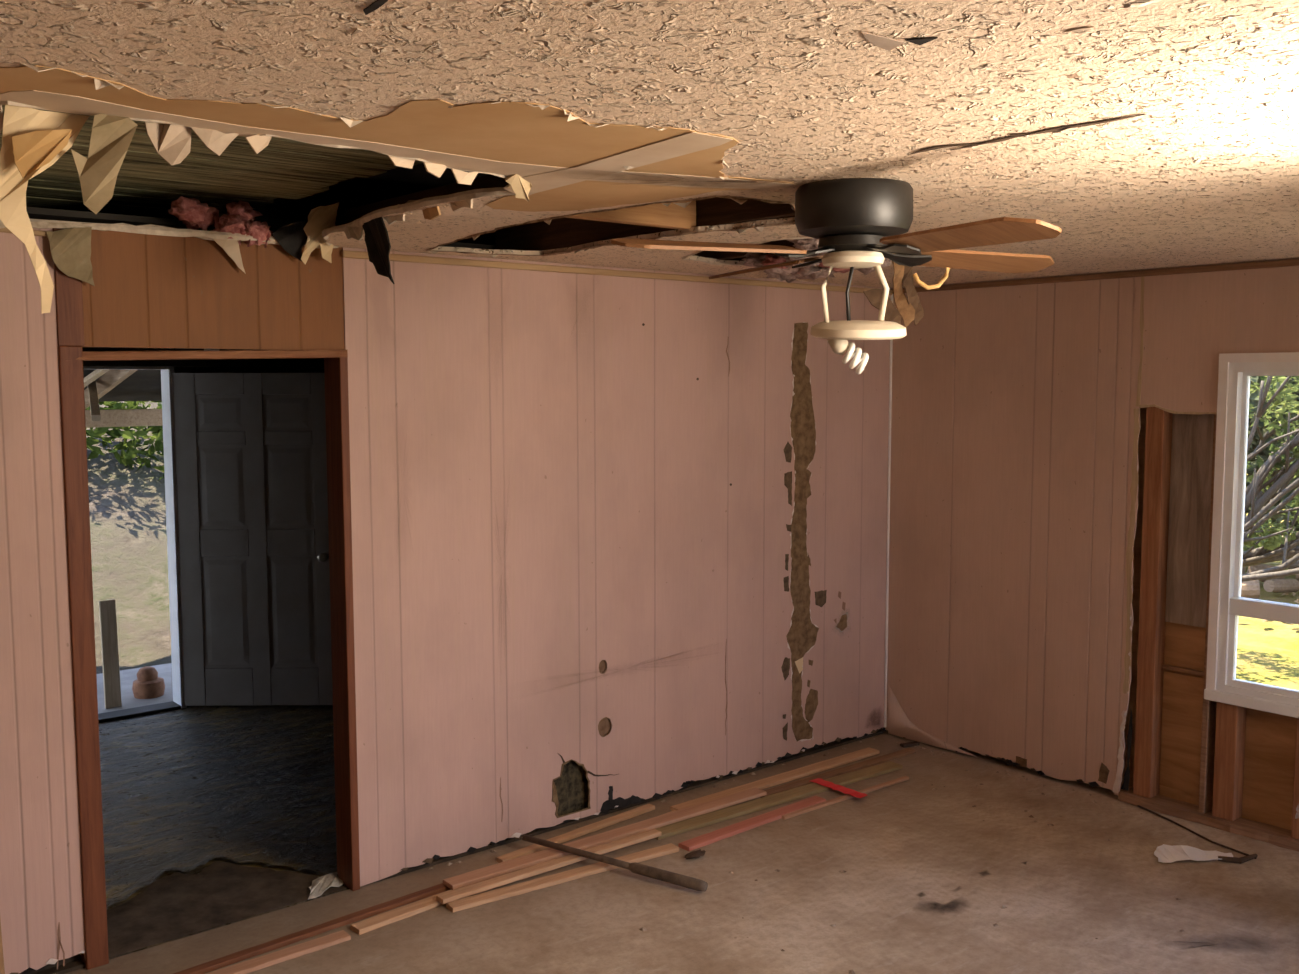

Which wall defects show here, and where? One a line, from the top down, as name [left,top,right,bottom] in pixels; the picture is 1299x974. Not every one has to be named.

peeling [20,63,124,90]
peeling [245,135,272,154]
peeling [527,104,608,127]
crack [911,113,1147,154]
peeling [388,155,478,220]
peeling [714,322,886,779]
spalling [552,754,694,822]
spalling [467,833,522,852]